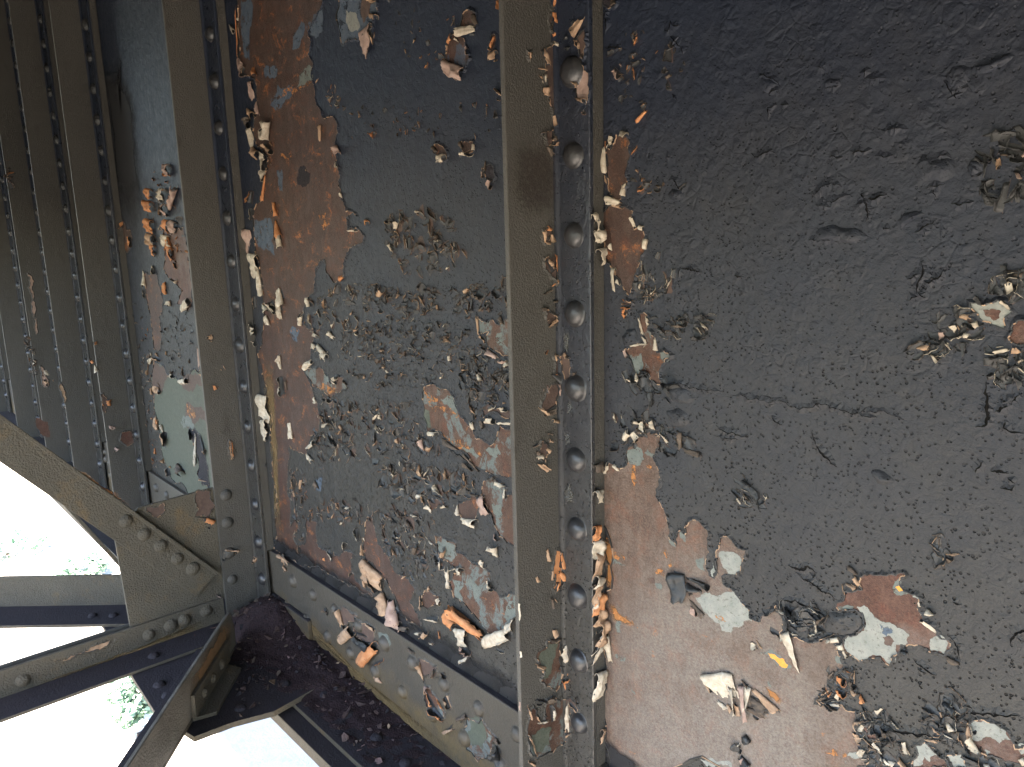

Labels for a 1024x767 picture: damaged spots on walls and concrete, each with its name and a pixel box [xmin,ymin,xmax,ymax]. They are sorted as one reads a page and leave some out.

peeling [113,164,218,529]
peeling [229,0,521,684]
crack [667,379,904,468]
peeling [591,30,1024,767]